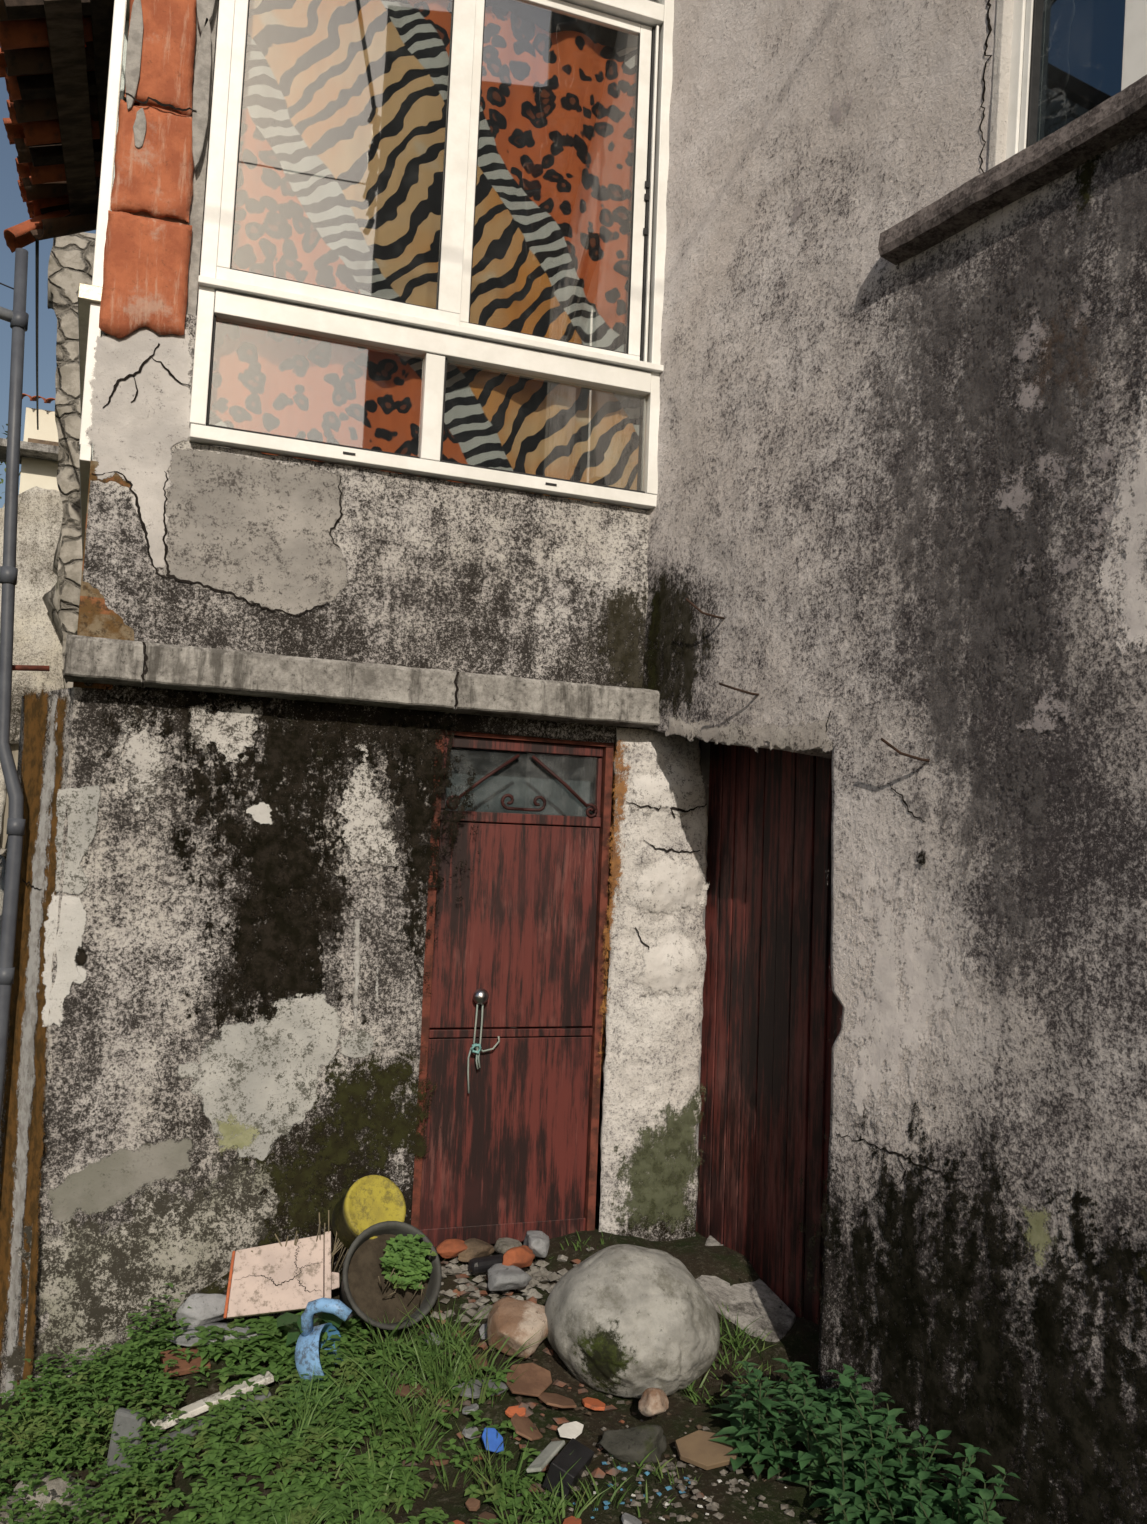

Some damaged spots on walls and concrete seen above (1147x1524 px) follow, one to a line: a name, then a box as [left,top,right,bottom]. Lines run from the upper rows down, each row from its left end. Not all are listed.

crack [979,0,992,173]
peeling [41,785,101,1027]
peeling [112,710,169,812]
crack [102,343,190,408]
peeling [85,326,348,617]
damp [88,680,489,1040]
damp [586,563,716,726]
damp [852,137,1147,991]
corrosion [0,688,68,1406]
spalling [178,993,374,1161]
damp [755,1089,1147,1524]